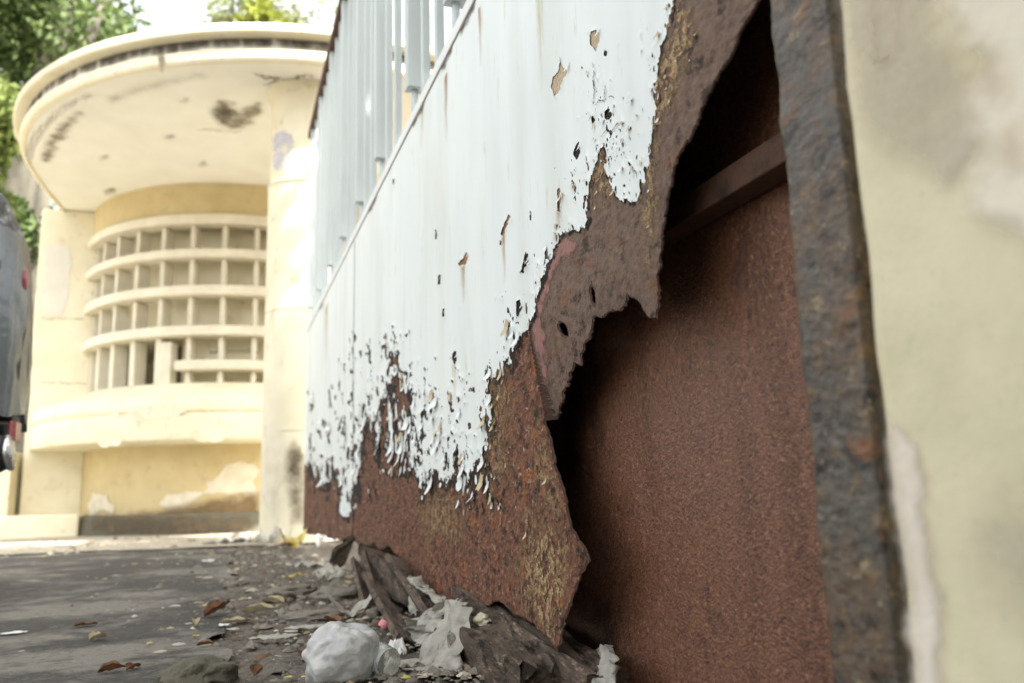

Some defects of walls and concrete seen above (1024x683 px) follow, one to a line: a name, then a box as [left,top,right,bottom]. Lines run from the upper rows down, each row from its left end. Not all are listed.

peeling [589,28,607,56]
peeling [551,61,568,95]
damp [25,95,90,162]
damp [214,102,261,128]
corrosion [303,0,757,648]
peeling [160,423,286,513]
peeling [87,492,114,515]
spalling [889,428,941,683]